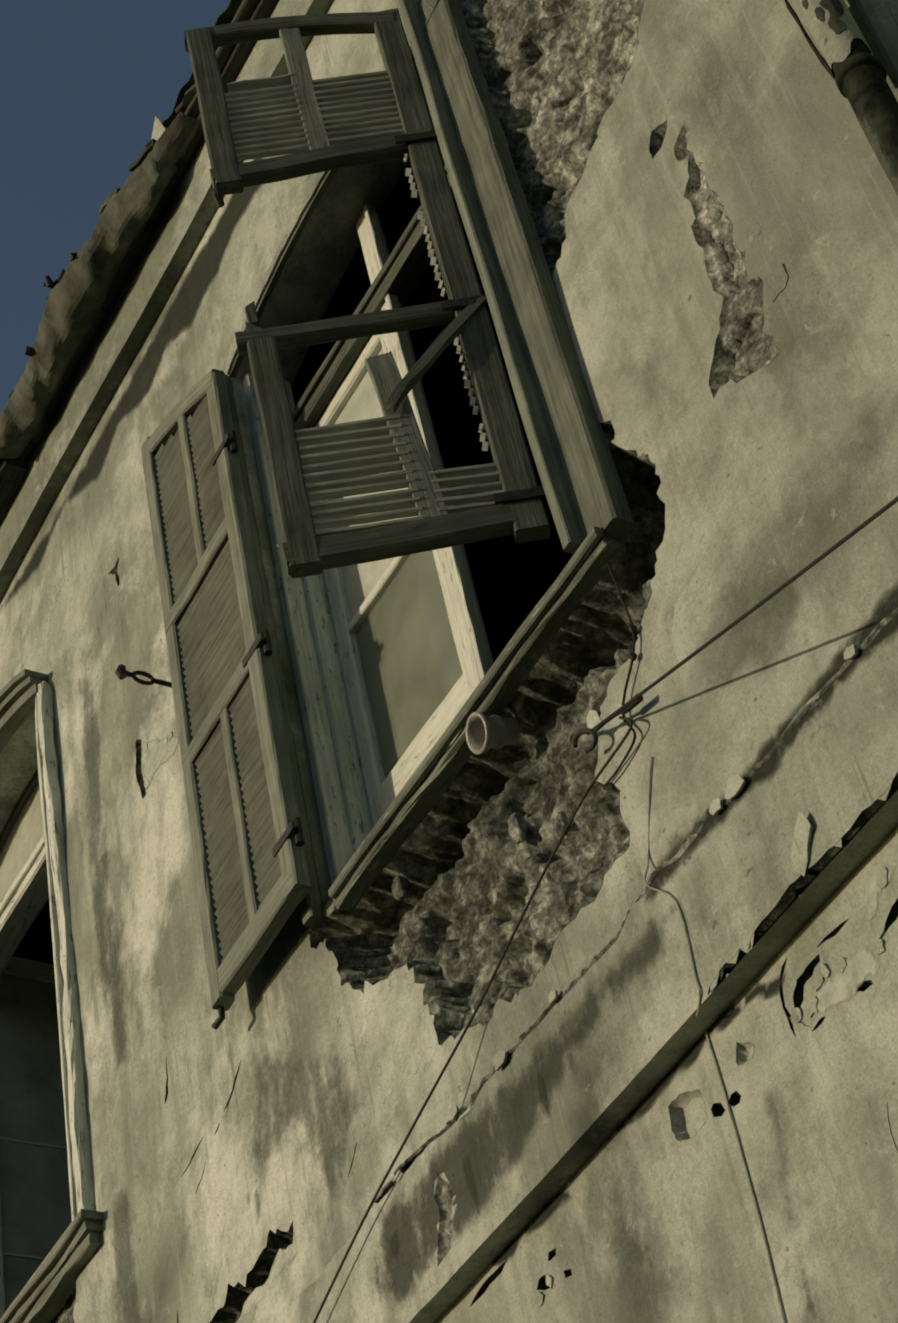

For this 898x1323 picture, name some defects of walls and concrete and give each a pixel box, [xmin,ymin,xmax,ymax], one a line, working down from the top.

flaking render [459,0,644,285]
flaking render [649,120,789,399]
flaking render [308,420,665,1045]
damp [647,586,898,898]
crack [779,958,825,1037]
flaking render [707,772,898,995]
crack [817,919,848,947]
peeling [791,866,893,1023]
flaking render [668,1089,708,1141]
spalling [209,1220,295,1323]